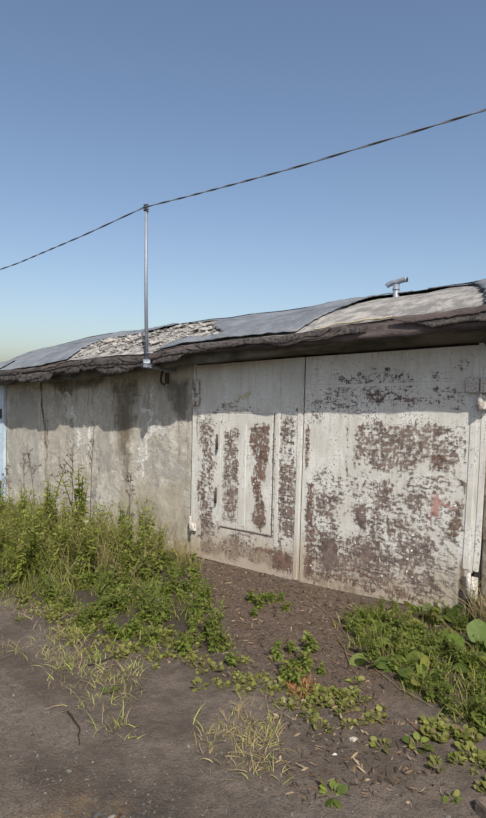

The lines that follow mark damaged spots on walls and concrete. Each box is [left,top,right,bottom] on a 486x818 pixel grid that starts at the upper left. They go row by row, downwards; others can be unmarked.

peeling [76,321,217,357]
leakage [114,382,173,478]
peeling [197,359,470,604]